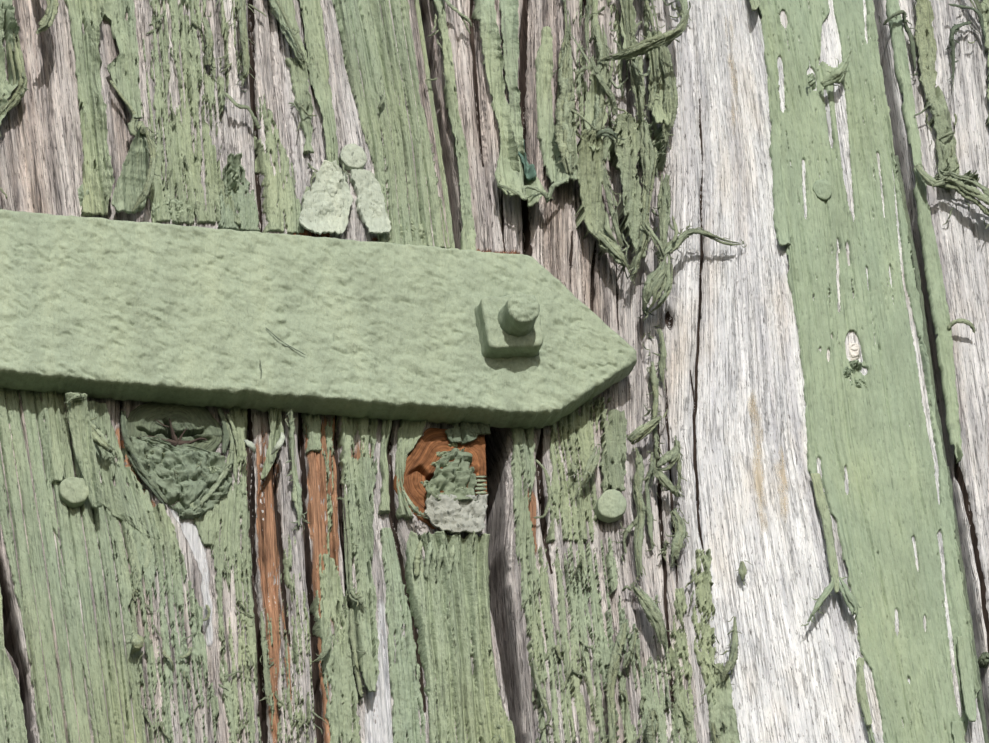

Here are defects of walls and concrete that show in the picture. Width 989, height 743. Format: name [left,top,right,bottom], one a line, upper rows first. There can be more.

crack [519,0,528,153]
crack [501,191,533,256]
peeling [0,0,747,743]
peeling [749,0,989,743]
peeling [735,561,752,585]